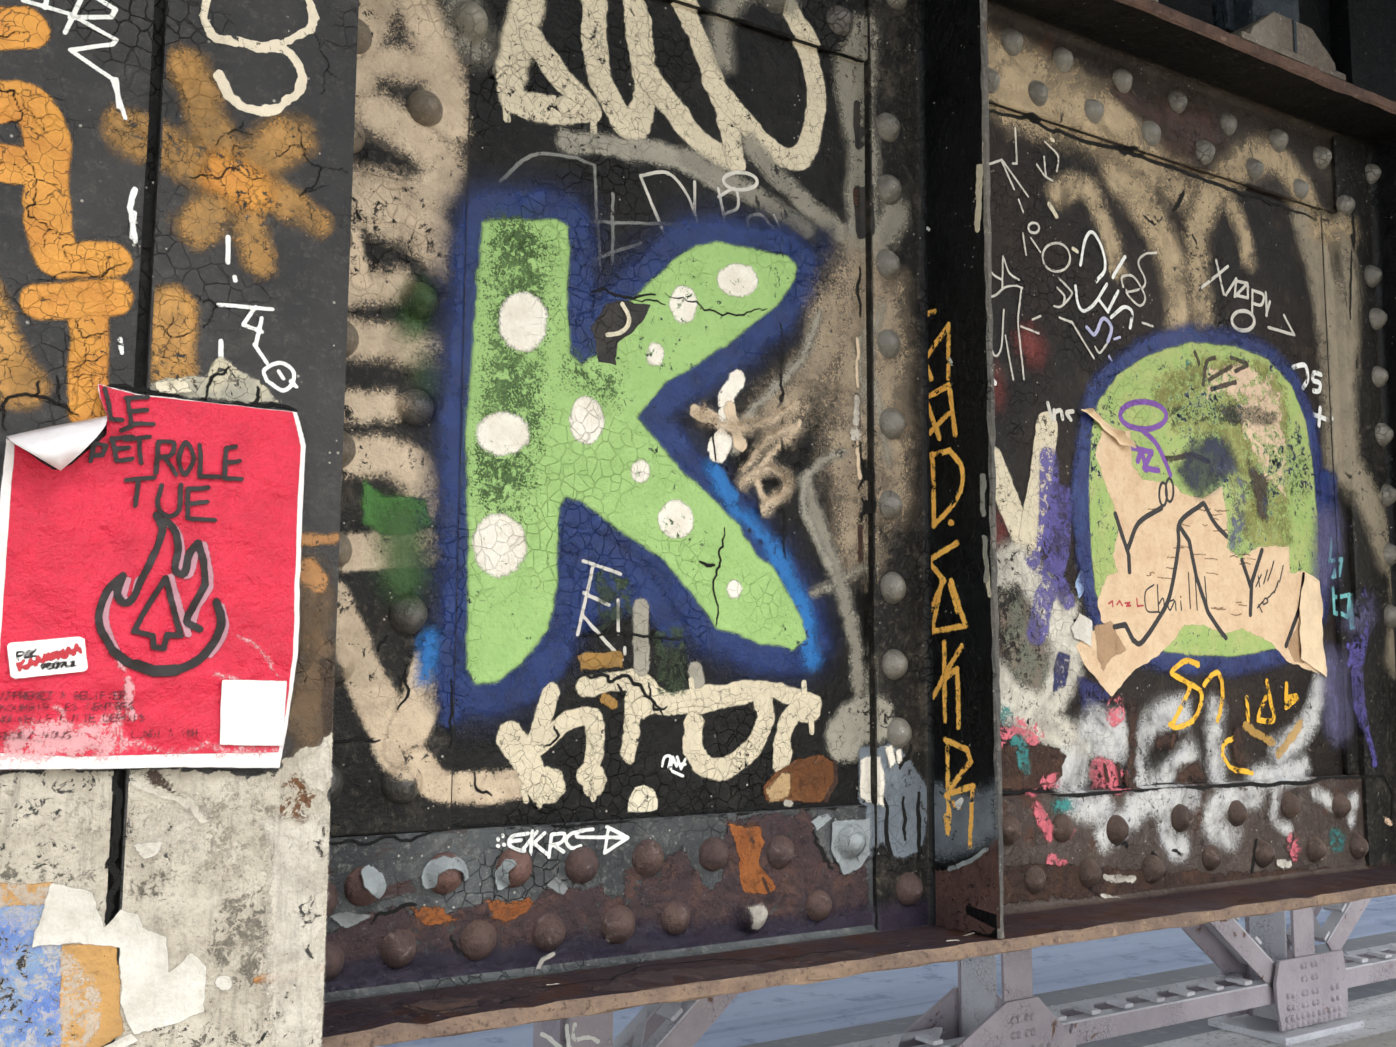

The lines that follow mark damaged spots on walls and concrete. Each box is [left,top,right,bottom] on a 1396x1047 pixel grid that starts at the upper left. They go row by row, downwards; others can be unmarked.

crack [0,89,126,281]
crack [0,295,297,430]
crack [634,293,786,558]
crack [580,630,684,641]
crack [377,636,410,710]
crack [575,673,667,715]
crack [332,736,380,744]
crack [545,726,560,747]
crack [329,771,869,846]
peeling [0,732,1393,1047]
rust [729,822,778,895]
rust [539,948,877,992]